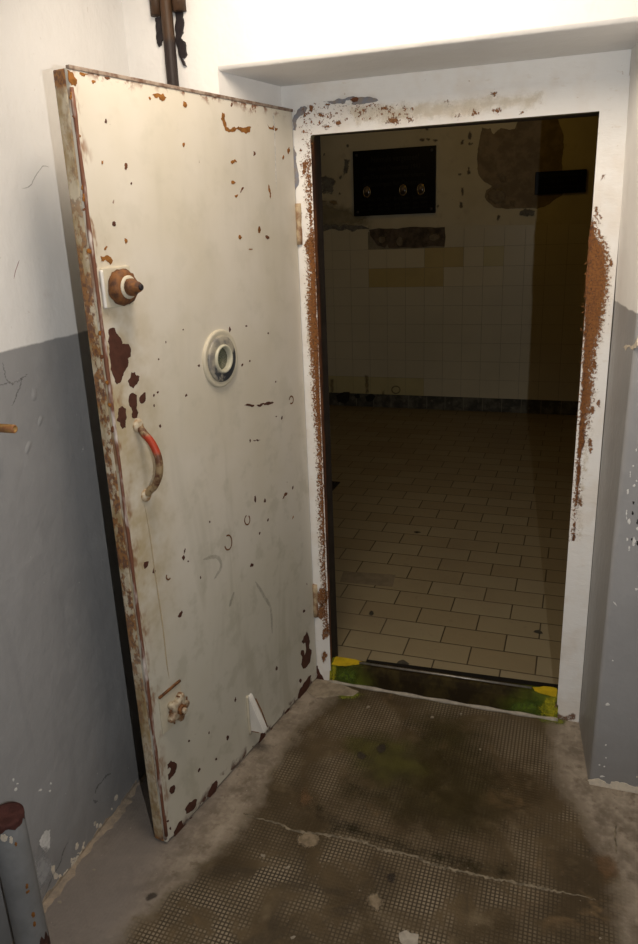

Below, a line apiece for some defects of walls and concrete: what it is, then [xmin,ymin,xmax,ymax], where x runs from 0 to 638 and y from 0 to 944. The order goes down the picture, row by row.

flaking render [459,119,564,220]
peeling [369,227,446,248]
rust [98,328,159,433]
rust [282,103,414,698]
rust [569,207,613,542]
peeling [626,465,638,551]
peeling [588,744,638,794]
flaking render [35,772,147,913]
crack [244,813,596,900]